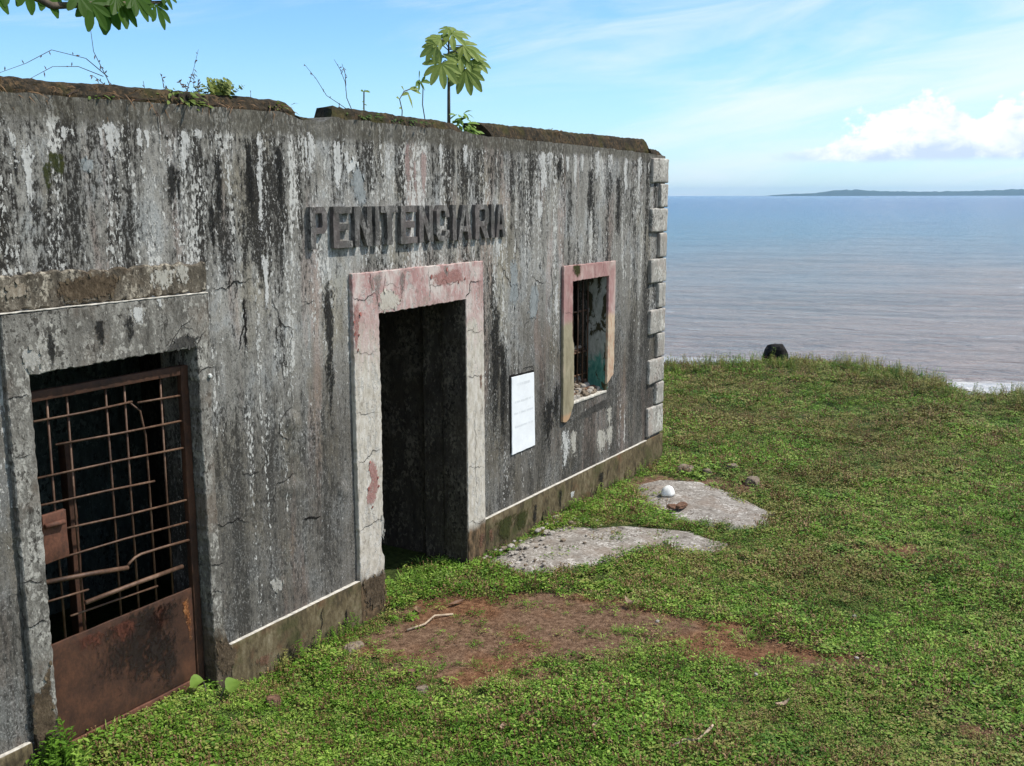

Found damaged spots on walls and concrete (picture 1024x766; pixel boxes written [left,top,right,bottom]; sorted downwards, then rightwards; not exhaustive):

damp [7,131,51,216]
damp [98,120,123,162]
damp [167,129,202,209]
damp [244,134,283,236]
damp [537,151,642,241]
crack [212,276,251,350]
damp [321,276,335,430]
peeling [379,288,402,313]
peeling [430,268,466,286]
damp [490,298,507,449]
spalling [577,399,610,420]
peeling [367,461,385,538]